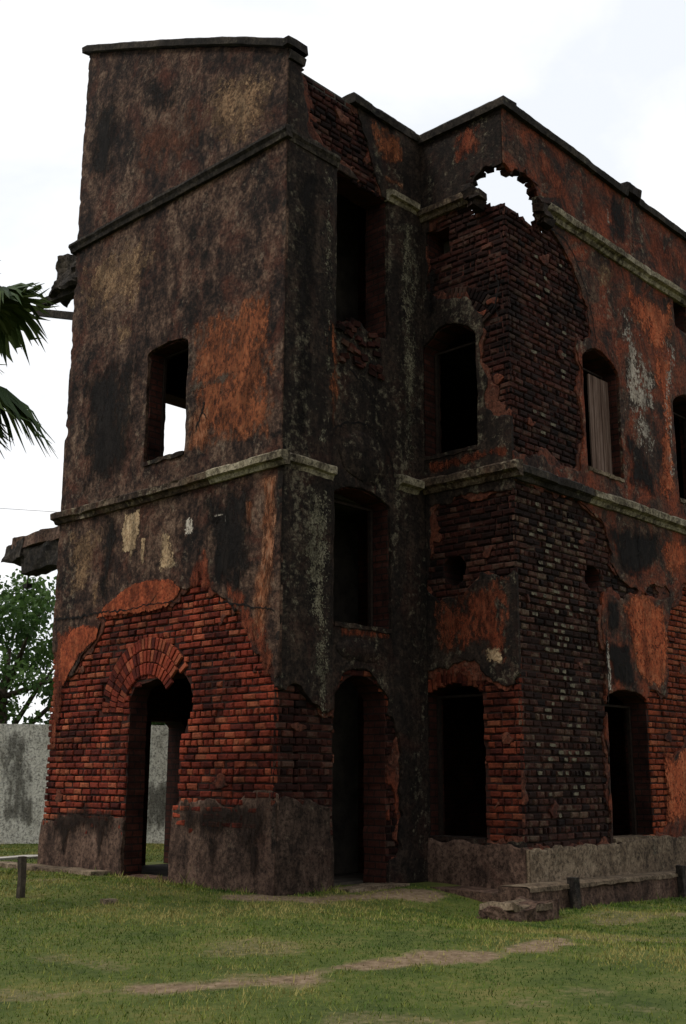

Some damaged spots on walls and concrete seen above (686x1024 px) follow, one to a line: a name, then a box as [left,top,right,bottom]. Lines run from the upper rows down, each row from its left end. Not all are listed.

damp [91,95,121,177]
flaking render [304,75,402,201]
flaking render [427,150,589,469]
damp [3,734,36,823]
flaking render [43,531,333,840]
flaking render [427,480,686,848]